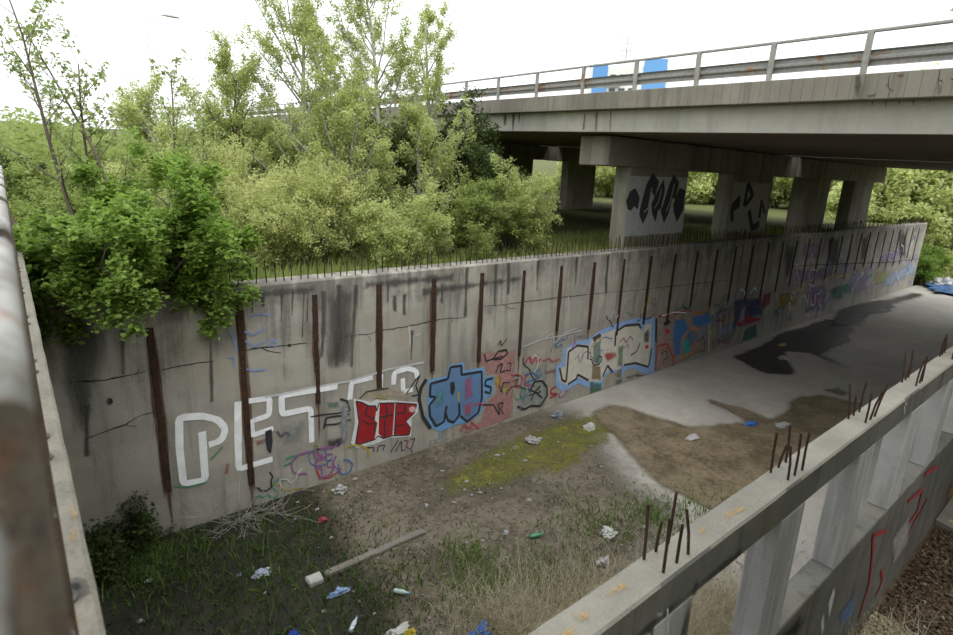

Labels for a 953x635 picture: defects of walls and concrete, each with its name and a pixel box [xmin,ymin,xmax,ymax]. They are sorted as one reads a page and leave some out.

water stain [240,263,517,366]
crack [92,411,154,437]
crack [74,361,213,382]
corrosion [147,344,173,521]
corrosion [236,311,253,464]